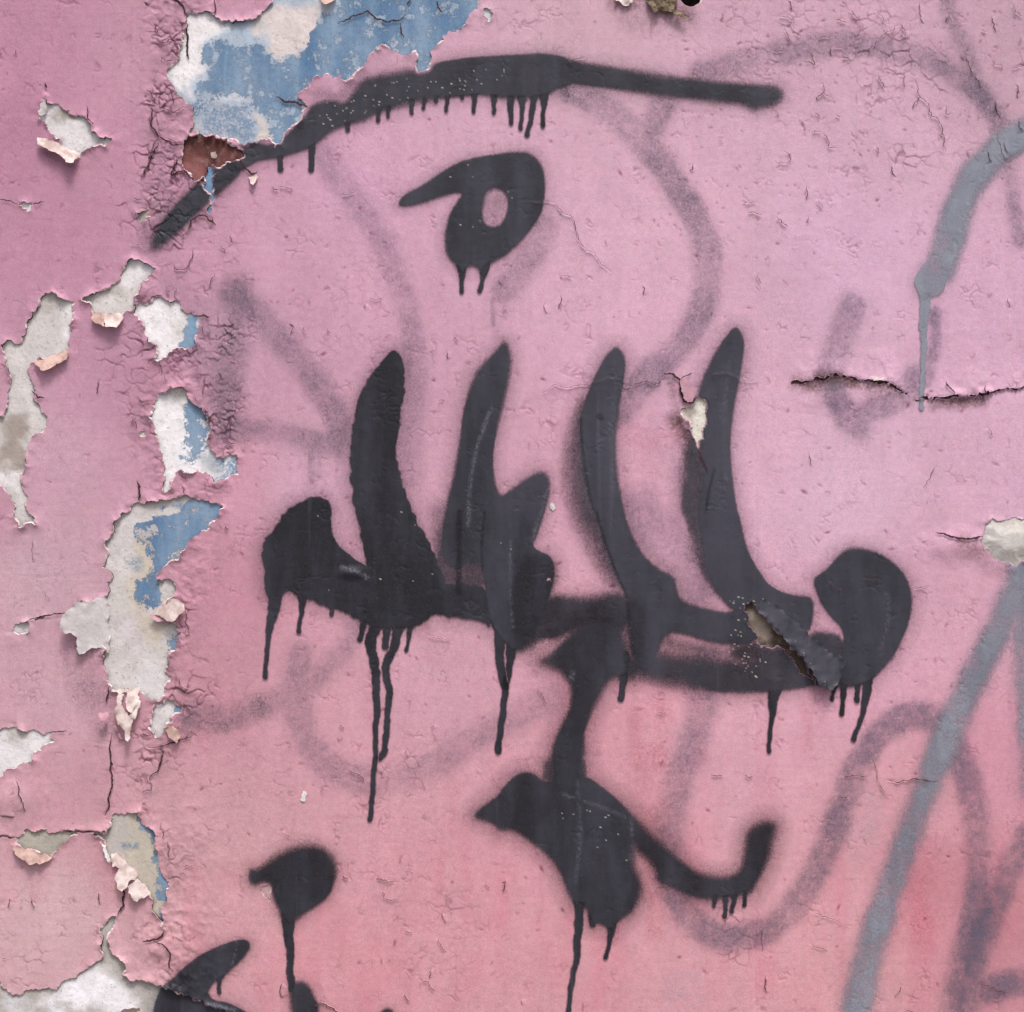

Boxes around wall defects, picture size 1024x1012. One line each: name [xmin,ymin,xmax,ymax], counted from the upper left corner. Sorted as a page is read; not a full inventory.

peeling [37,83,112,163]
crack [133,88,194,200]
peeling [141,0,493,228]
crack [174,214,232,301]
peeling [0,258,209,527]
crack [193,372,235,458]
peeling [664,373,708,474]
crack [791,373,1024,402]
peeling [13,387,238,743]
peeling [0,727,66,776]
crack [61,737,113,833]
peeling [0,812,173,1012]